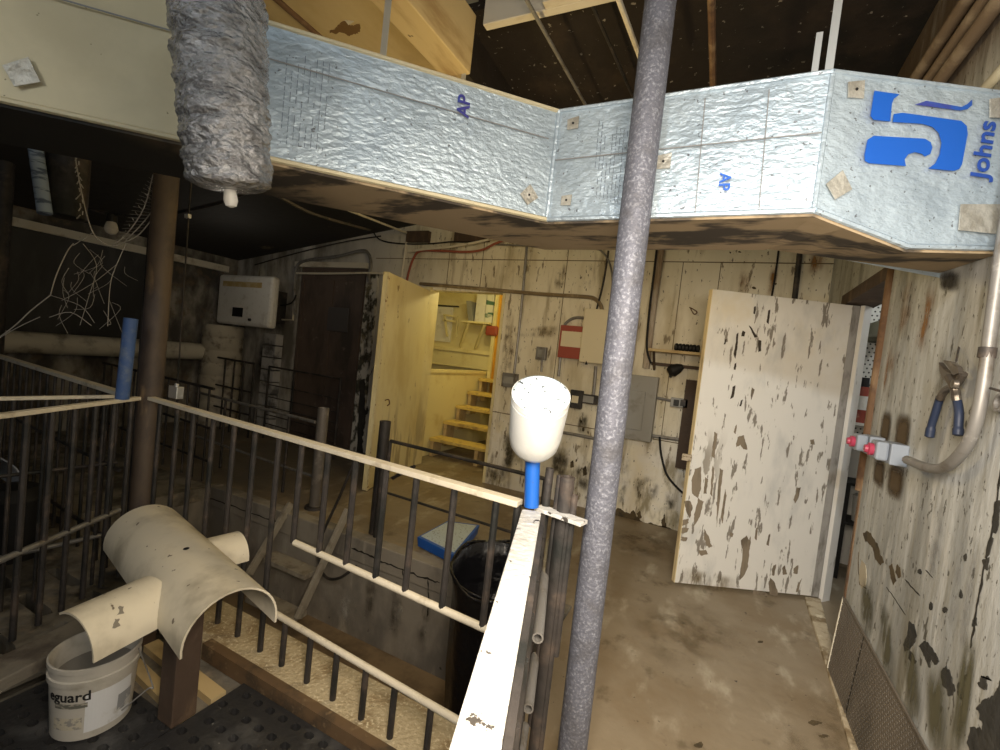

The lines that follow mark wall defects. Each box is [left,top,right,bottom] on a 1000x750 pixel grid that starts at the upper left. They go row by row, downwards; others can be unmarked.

peeling [724,326,761,370]
peeling [734,425,747,450]
peeling [615,432,727,556]
peeling [730,527,770,579]
peeling [752,565,802,596]
spalling [863,531,901,585]
crack [970,472,1000,648]
peeling [903,621,967,699]
peeling [967,676,1000,750]